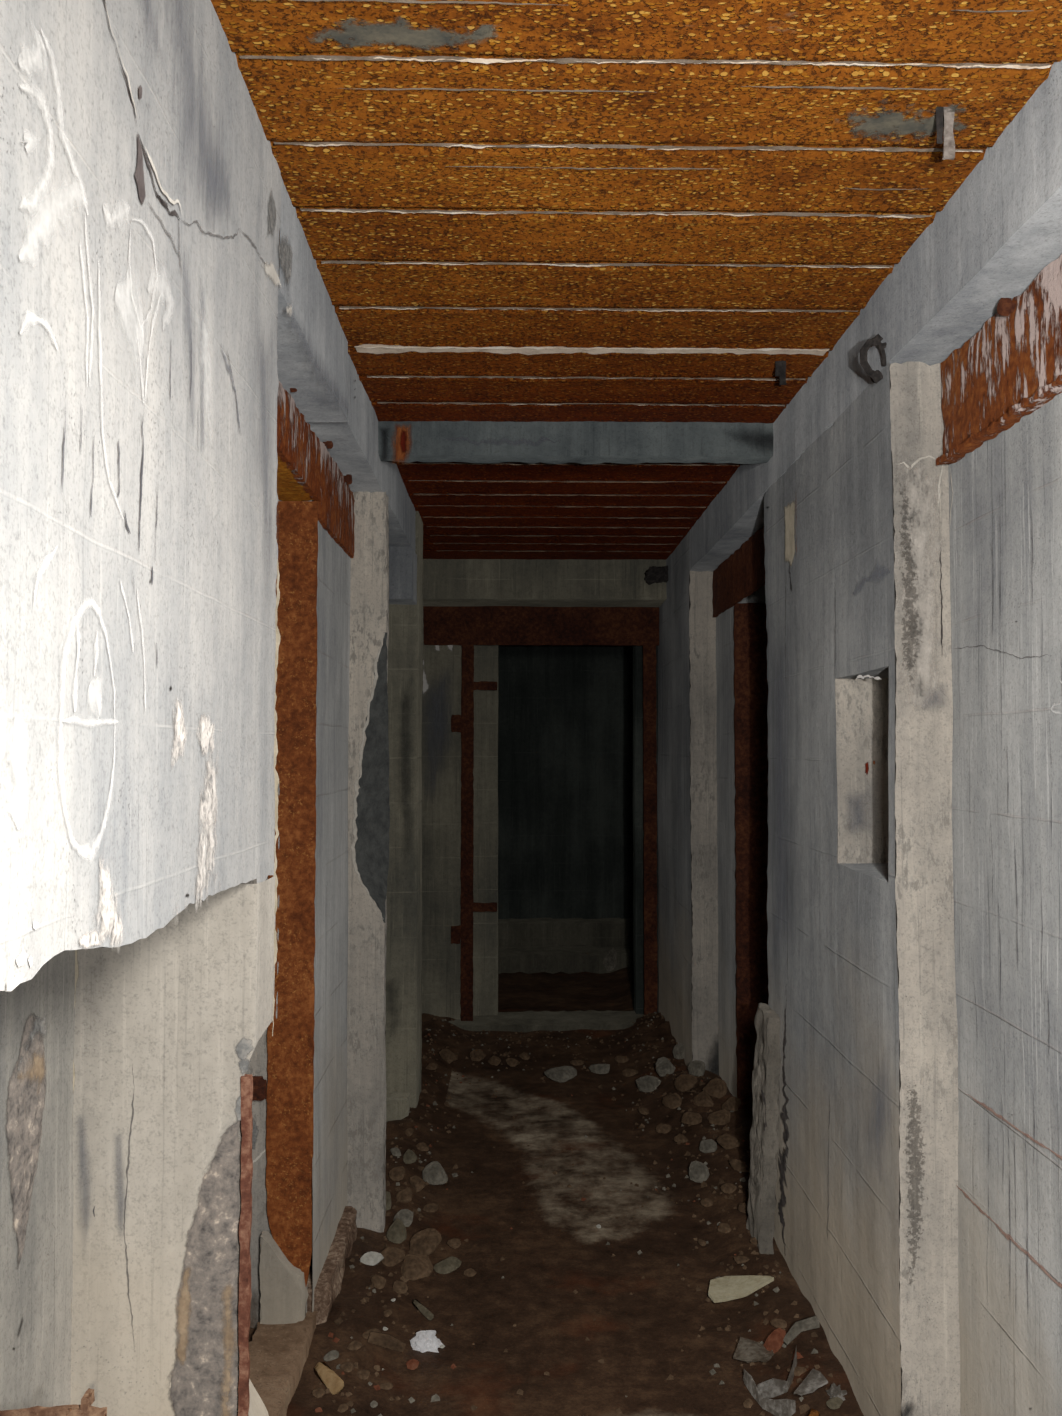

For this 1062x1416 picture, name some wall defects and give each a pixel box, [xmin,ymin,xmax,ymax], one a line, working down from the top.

crack [104,0,267,272]
corrosion [395,426,411,462]
peeling [172,702,218,902]
spalling [351,632,390,923]
peeling [7,951,33,991]
spalling [6,1014,46,1267]
peeling [80,865,123,948]
spalling [236,1038,253,1074]
spalling [169,1096,241,1416]